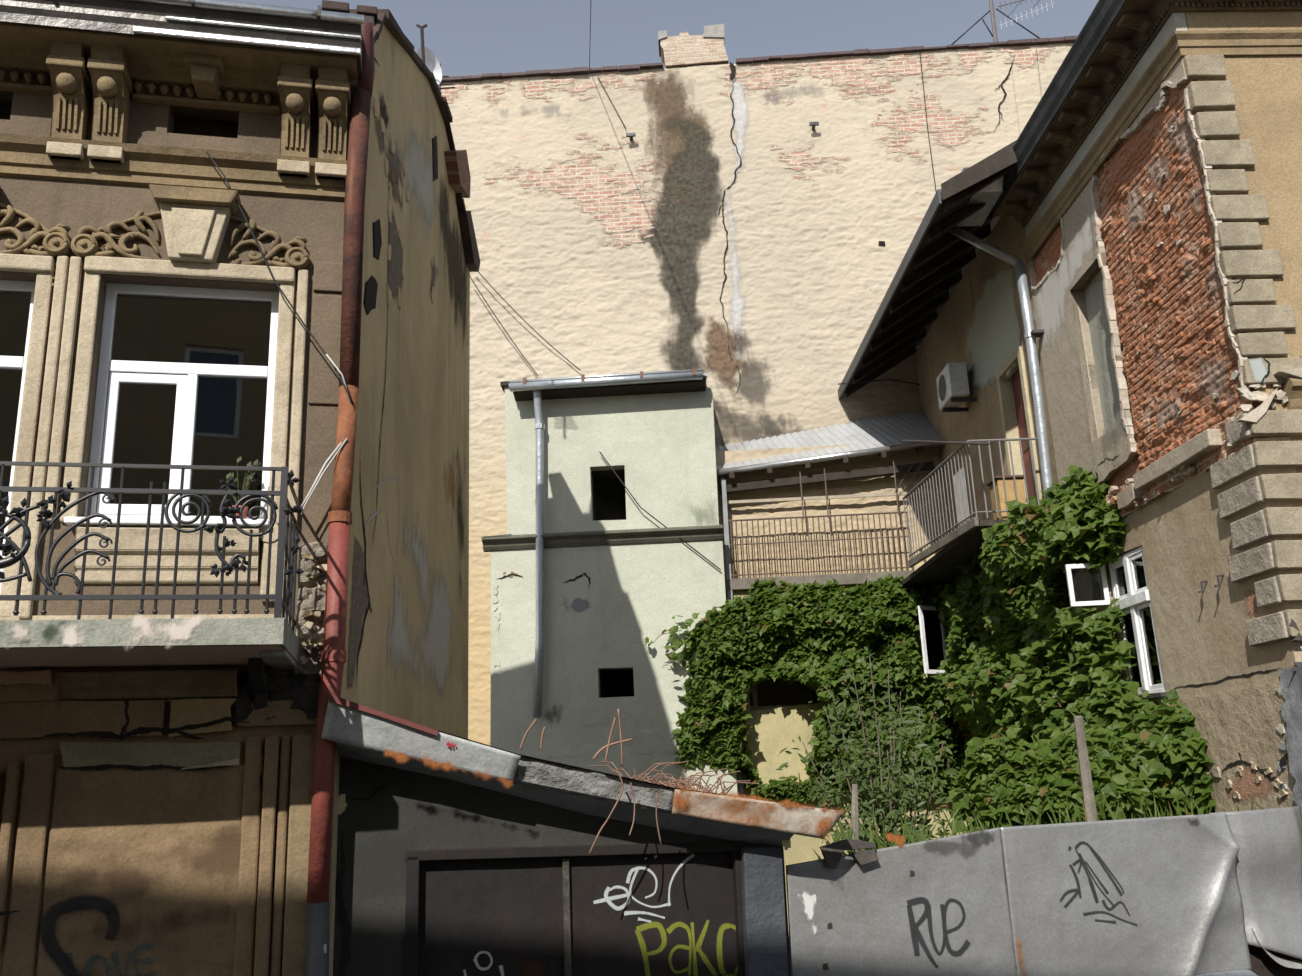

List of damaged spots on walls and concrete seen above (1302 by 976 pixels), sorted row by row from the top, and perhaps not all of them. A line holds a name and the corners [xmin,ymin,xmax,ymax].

crack [994,55,1015,131]
leakage [641,73,785,442]
crack [718,62,742,396]
spalling [1090,77,1288,518]
crack [31,697,265,792]
corrosion [385,749,457,770]
corrosion [722,793,844,832]
spalling [1204,686,1296,800]